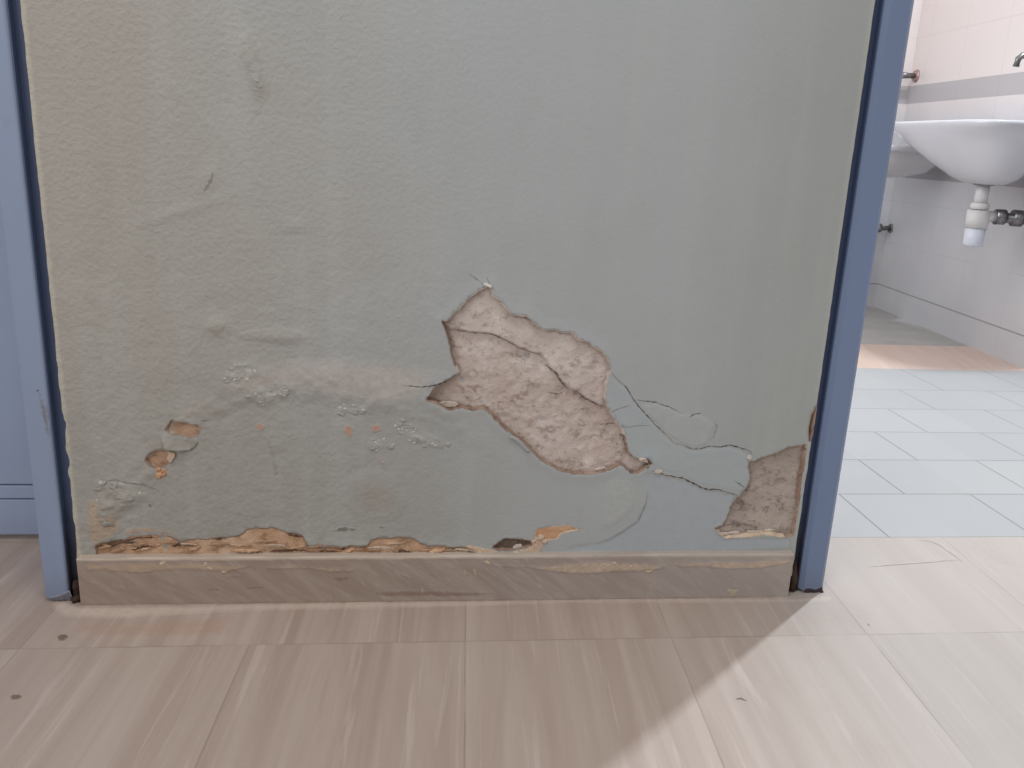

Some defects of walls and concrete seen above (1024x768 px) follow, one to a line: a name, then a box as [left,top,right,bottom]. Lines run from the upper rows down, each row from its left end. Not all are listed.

peeling [144,420,201,479]
leakage [114,357,442,507]
spalling [426,283,817,565]
crack [611,372,755,495]
peeling [95,525,579,570]